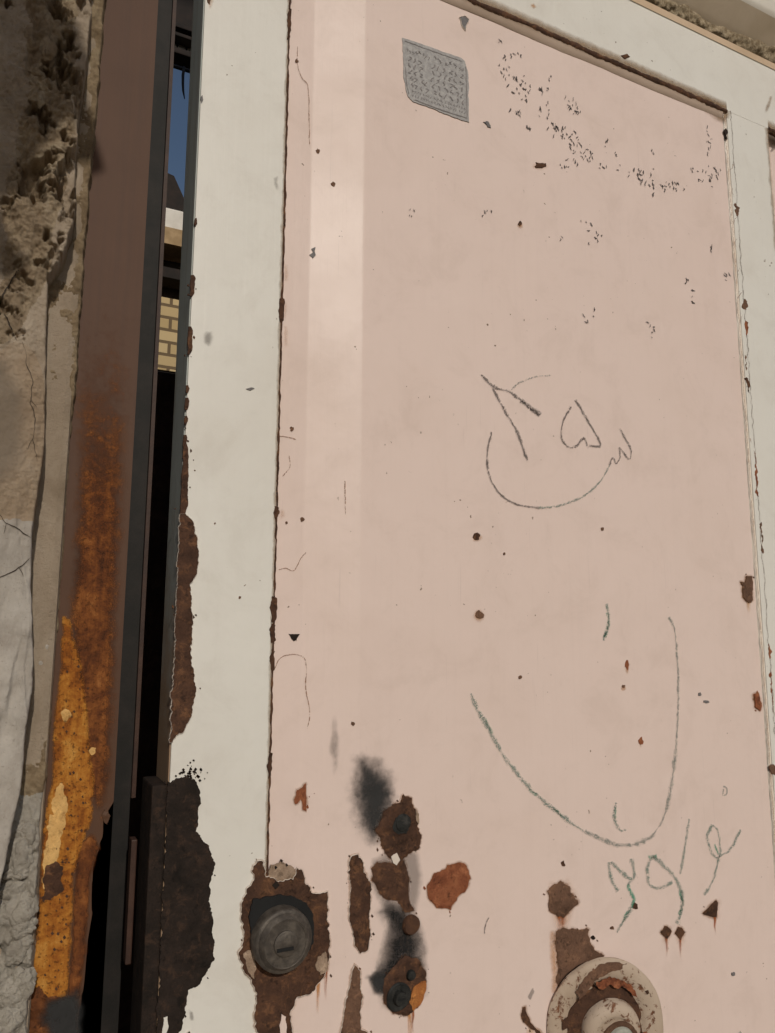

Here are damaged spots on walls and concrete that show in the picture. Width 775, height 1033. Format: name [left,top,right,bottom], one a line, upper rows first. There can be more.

spalling [0,0,78,344]
corrosion [740,574,755,603]
corrosion [29,405,121,1033]
peeling [156,759,216,1033]
corrosion [238,859,332,1033]
corrosion [340,794,422,1033]
corrosion [383,955,429,1025]
corrosion [423,862,471,913]
corrosion [543,881,649,999]